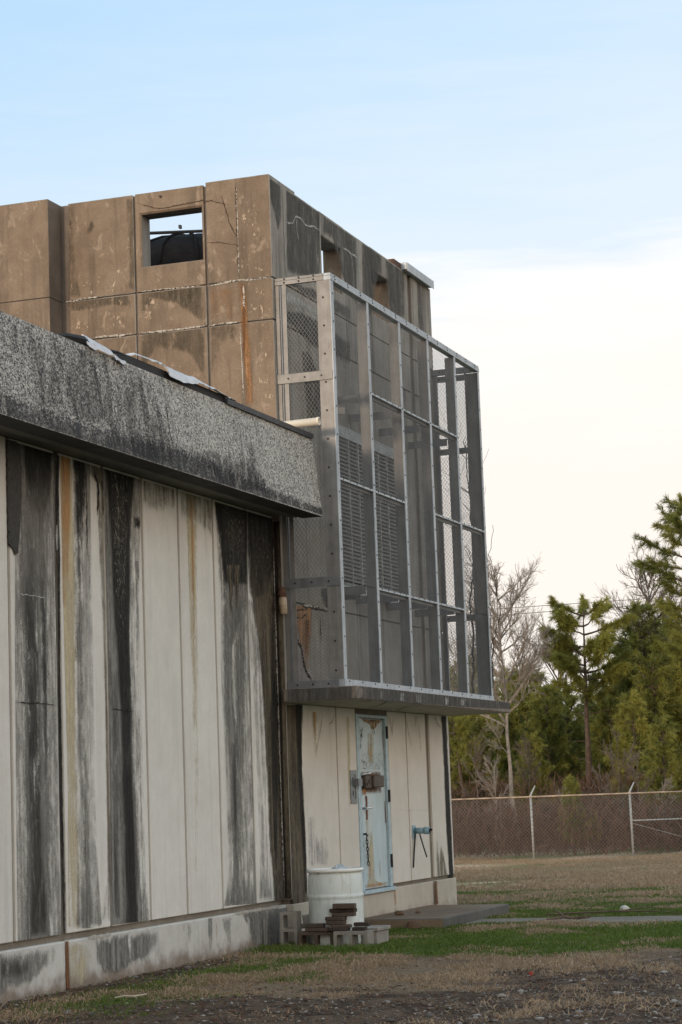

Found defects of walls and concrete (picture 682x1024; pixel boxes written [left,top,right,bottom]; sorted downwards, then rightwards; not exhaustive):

crack [137,186,239,274]
crack [283,196,323,265]
rust [241,286,252,403]
leakage [67,353,172,461]
leakage [198,428,267,491]
rust [186,493,197,717]
leakage [15,444,62,941]
leakage [73,460,510,972]
rust [347,718,381,820]
leakage [0,951,47,993]